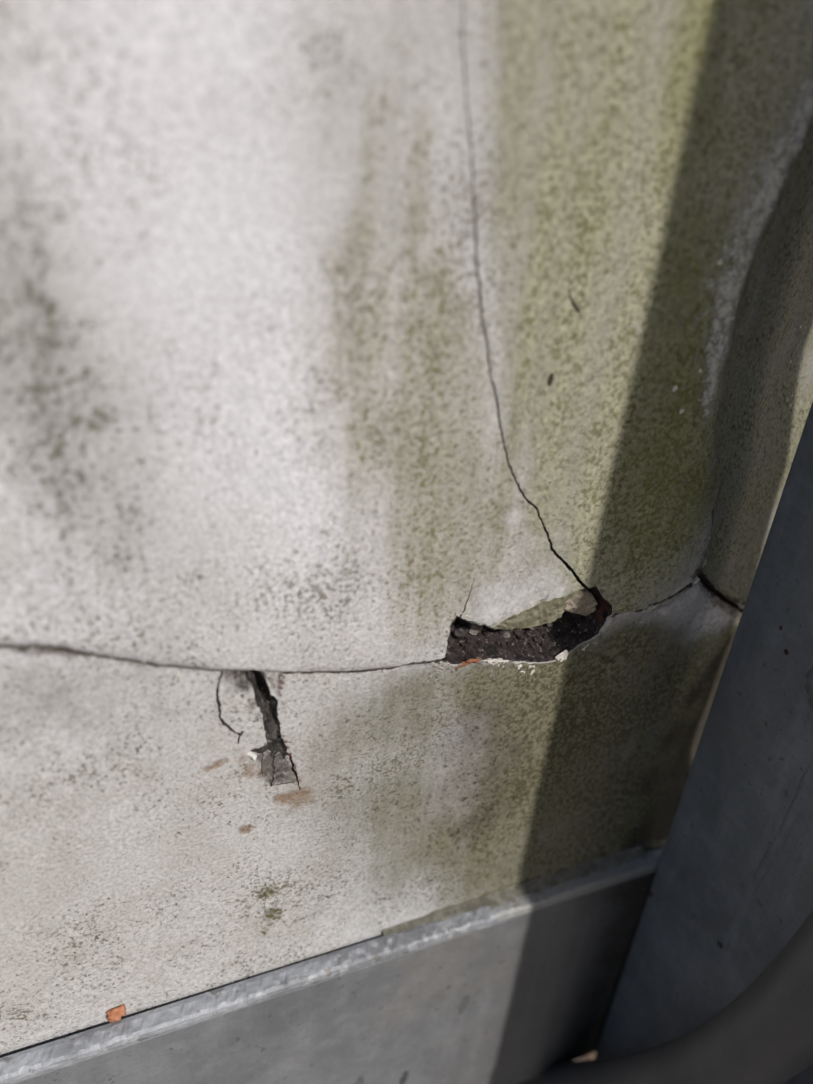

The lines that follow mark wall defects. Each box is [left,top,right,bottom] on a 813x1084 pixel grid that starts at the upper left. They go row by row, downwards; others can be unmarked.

crack [462,0,588,589]
damp [609,0,726,568]
crack [0,644,222,676]
crack [280,656,449,678]
crack [458,578,475,619]
damp [477,570,566,624]
spalling [431,586,612,675]
spalling [216,669,300,790]
damp [628,629,737,848]